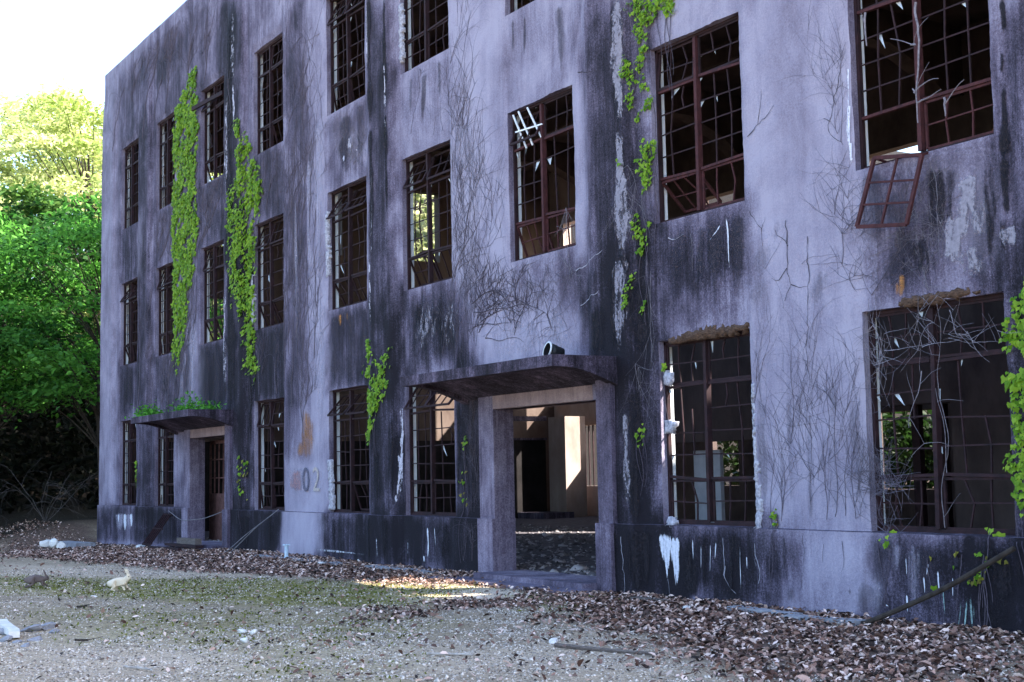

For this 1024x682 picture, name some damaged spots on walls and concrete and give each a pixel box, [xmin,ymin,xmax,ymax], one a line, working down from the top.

peeling [610,2,624,117]
leakage [340,1,387,235]
leakage [206,24,276,440]
peeling [614,134,632,249]
leakage [928,171,953,227]
peeling [945,175,986,275]
leakage [984,168,996,252]
peeling [613,262,628,338]
peeling [623,415,631,498]
leakage [118,514,132,530]
leakage [423,526,448,560]
leakage [614,531,716,595]